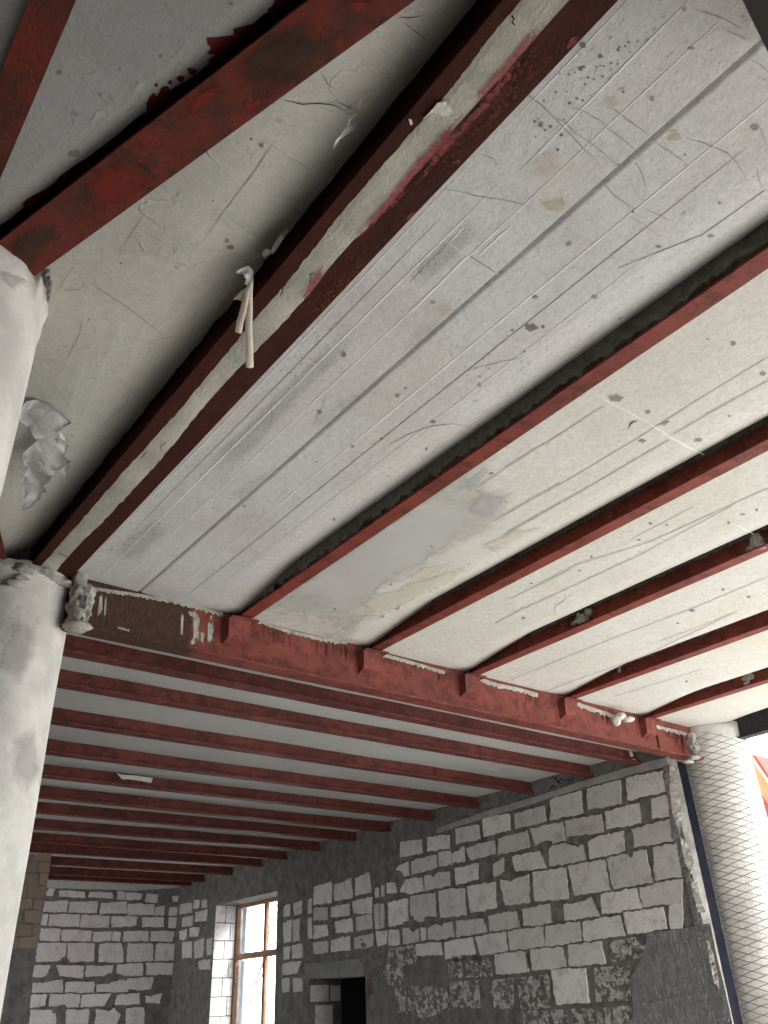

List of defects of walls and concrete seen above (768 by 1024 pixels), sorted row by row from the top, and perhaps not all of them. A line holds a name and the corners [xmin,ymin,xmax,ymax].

crack [285,75,353,112]
leakage [269,473,499,630]